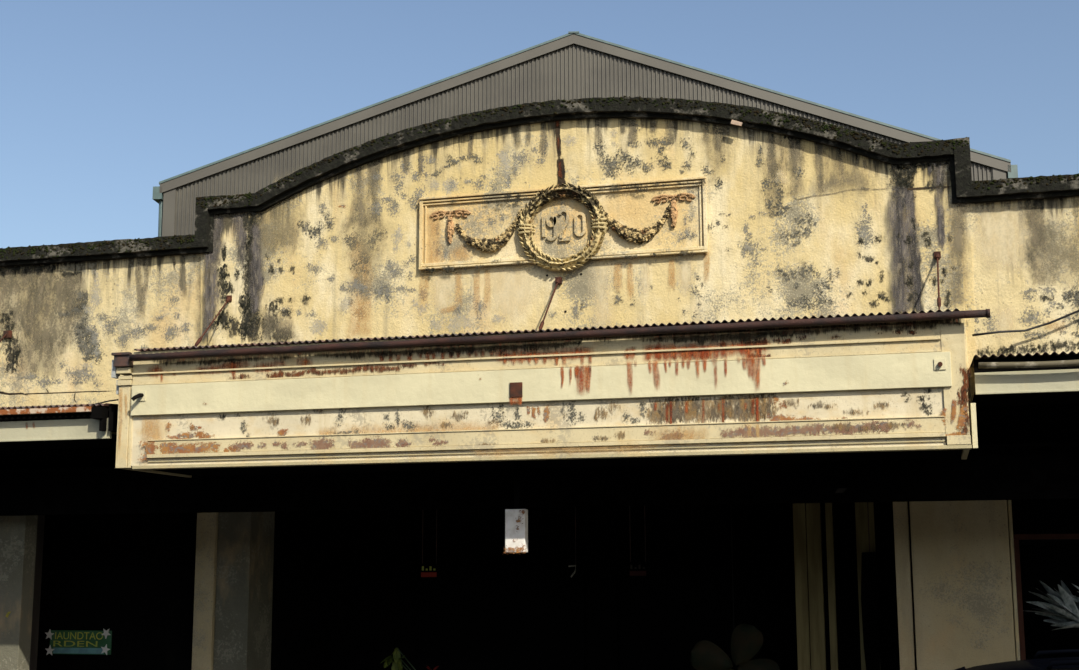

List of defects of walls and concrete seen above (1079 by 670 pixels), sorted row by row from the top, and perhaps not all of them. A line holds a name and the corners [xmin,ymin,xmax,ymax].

damp [847,160,967,313]
damp [173,256,186,294]
damp [197,198,311,343]
damp [0,262,83,374]
rust [138,422,334,462]
rust [348,435,412,453]
peeling [383,409,416,432]
peeling [423,405,469,428]
peeling [489,404,534,429]
peeling [560,393,905,441]
rust [626,335,922,440]
rust [941,366,971,436]